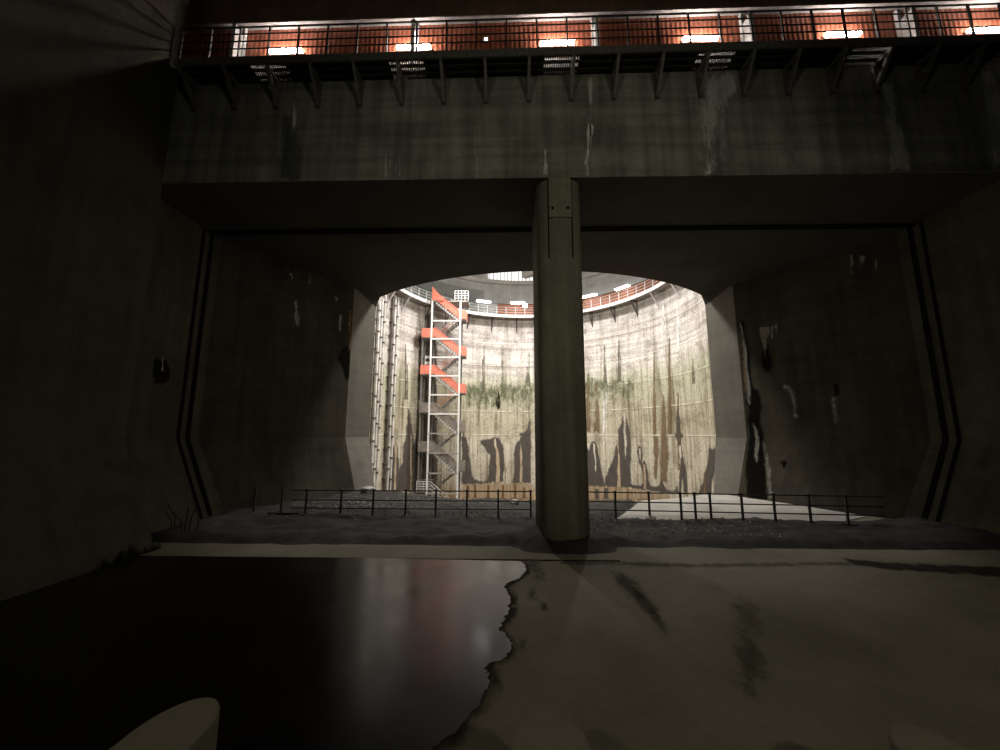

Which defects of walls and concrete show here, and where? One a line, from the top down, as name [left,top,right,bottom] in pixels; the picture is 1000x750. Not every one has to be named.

damp [701,73,736,174]
damp [389,313,438,490]
damp [469,347,530,410]
damp [587,301,716,495]
damp [461,421,531,484]